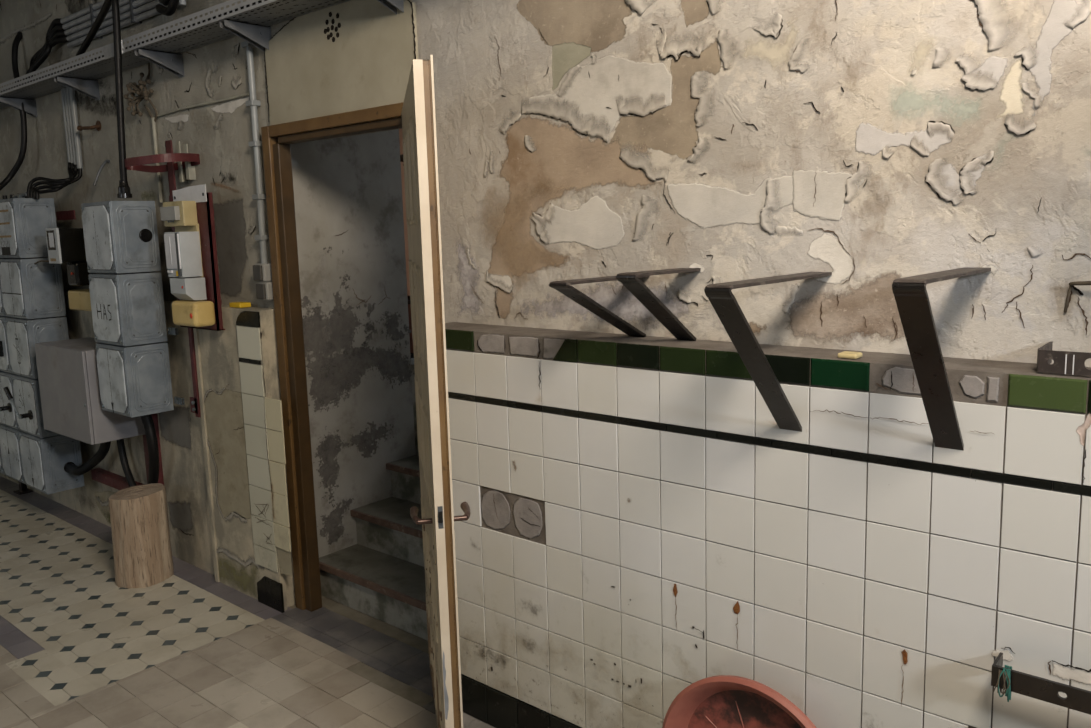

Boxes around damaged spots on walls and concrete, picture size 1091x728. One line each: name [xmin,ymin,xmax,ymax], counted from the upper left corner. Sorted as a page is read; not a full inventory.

peeling [932,0,1091,135]
peeling [486,0,994,322]
peeling [784,271,905,342]
peeling [477,334,565,359]
peeling [876,366,921,395]
peeling [959,375,1000,402]
spalling [1048,660,1091,684]